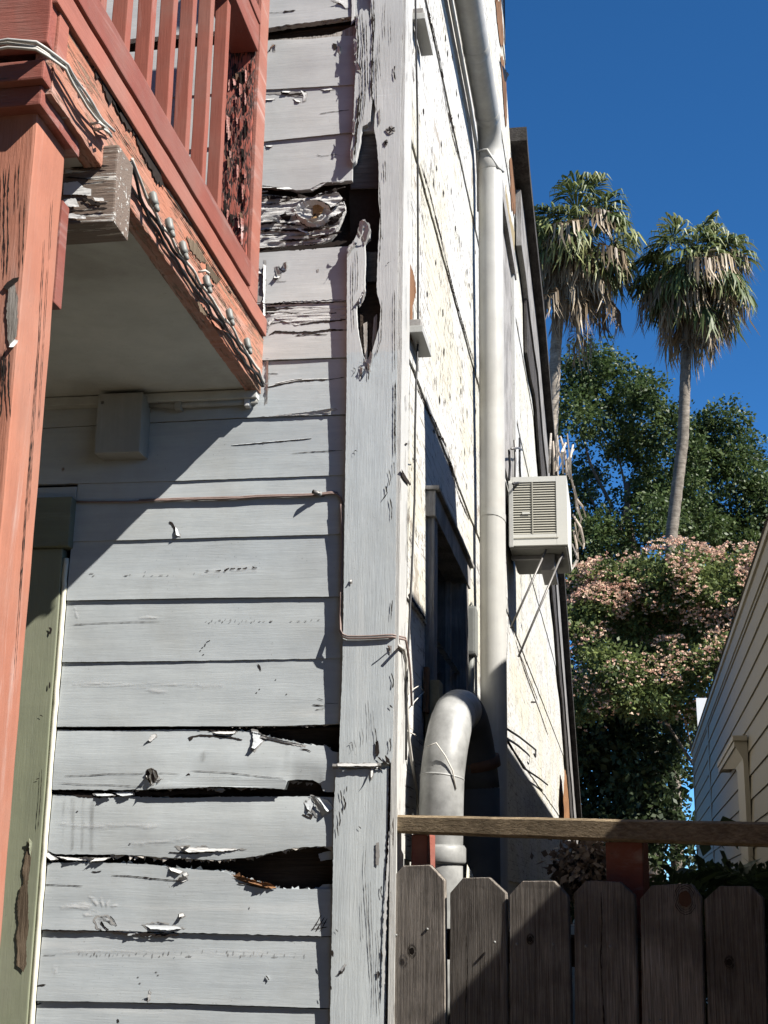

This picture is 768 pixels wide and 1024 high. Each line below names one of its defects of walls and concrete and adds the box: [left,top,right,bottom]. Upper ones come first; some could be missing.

peeling [224,63,251,246]
peeling [63,169,104,219]
crack [190,729,311,752]
crack [66,773,144,787]
crack [202,770,278,778]
crack [45,871,189,886]
peeling [16,838,33,972]
peeling [93,915,117,930]
peeling [142,912,186,932]